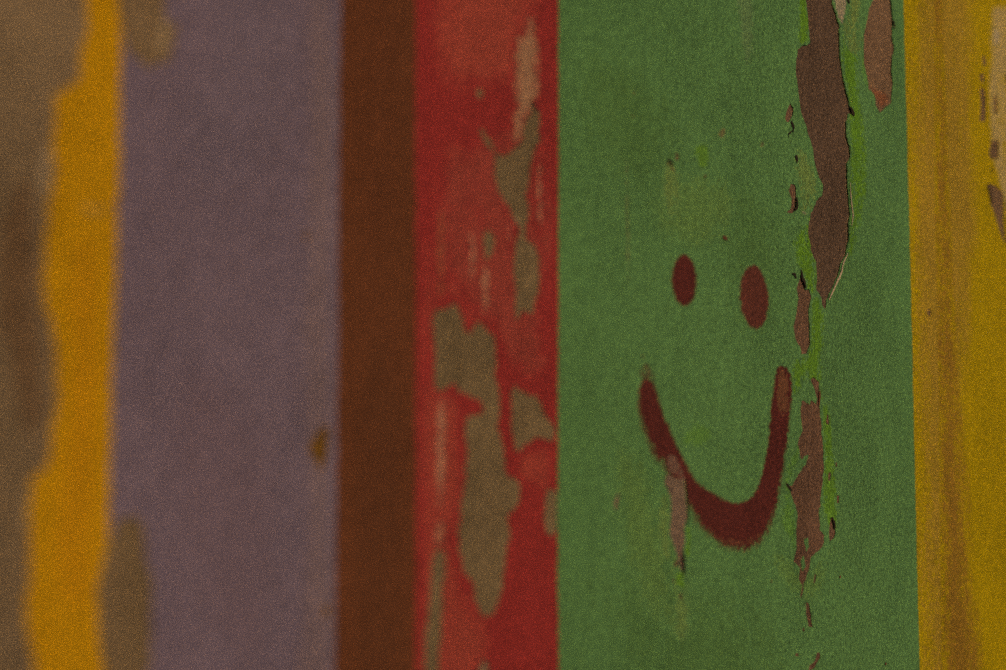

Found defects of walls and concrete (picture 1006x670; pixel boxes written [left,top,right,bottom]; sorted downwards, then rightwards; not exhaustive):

peeling [480,100,540,320]
peeling [785,0,854,354]
peeling [864,0,893,112]
peeling [980,56,997,122]
peeling [989,140,998,159]
peeling [987,184,1006,244]
damp [0,165,108,619]
peeling [424,549,446,670]
peeling [432,303,555,617]
peeling [786,377,837,631]